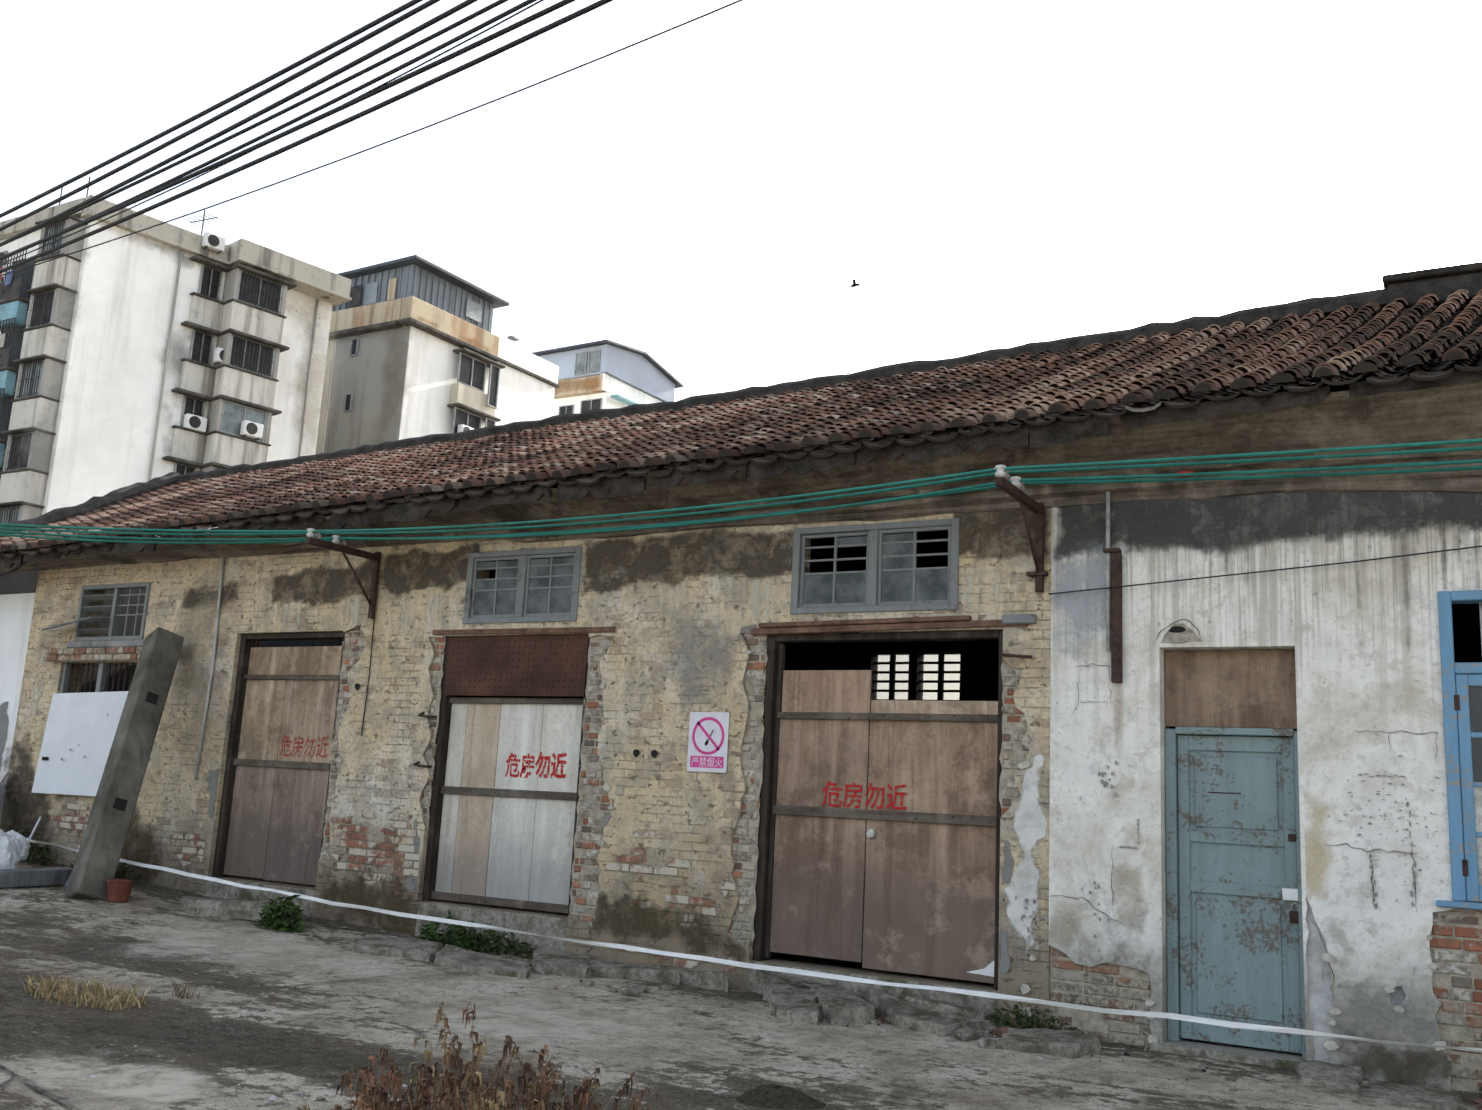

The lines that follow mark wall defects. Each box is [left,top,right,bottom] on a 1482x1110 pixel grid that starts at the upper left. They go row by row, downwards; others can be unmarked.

leakage [584,530,794,613]
corrosion [1103,548,1123,683]
leakage [953,491,1482,636]
peeling [320,626,447,899]
flaking render [569,633,768,971]
flaking render [1009,881,1158,1048]